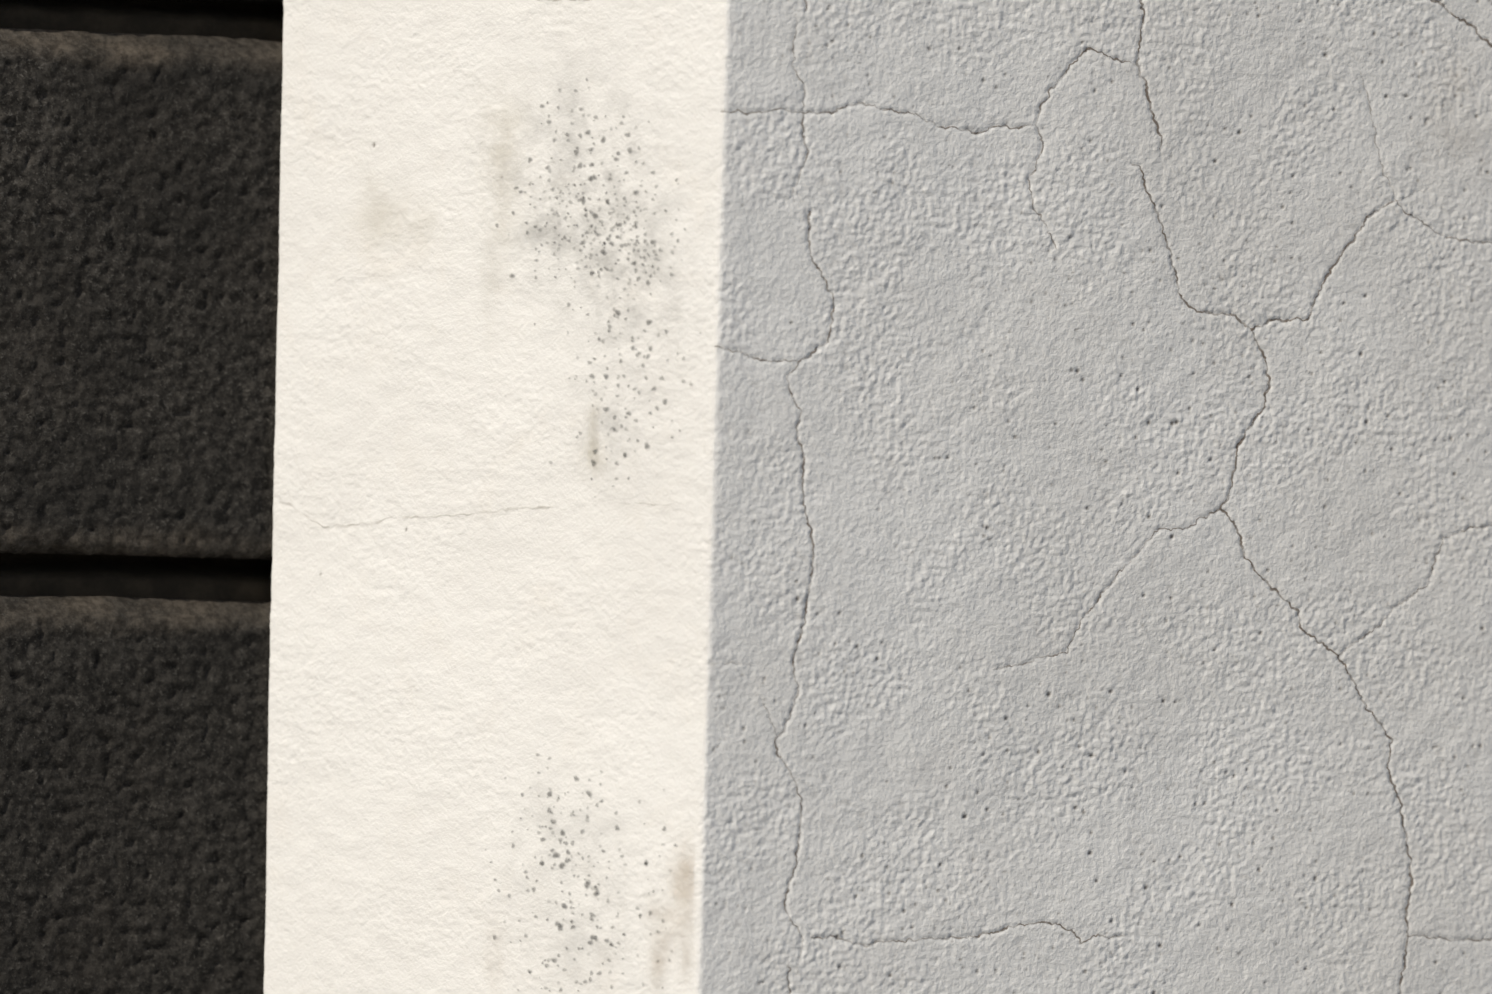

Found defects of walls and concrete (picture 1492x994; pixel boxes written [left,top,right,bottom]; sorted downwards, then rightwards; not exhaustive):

crack [714,0,1492,985]